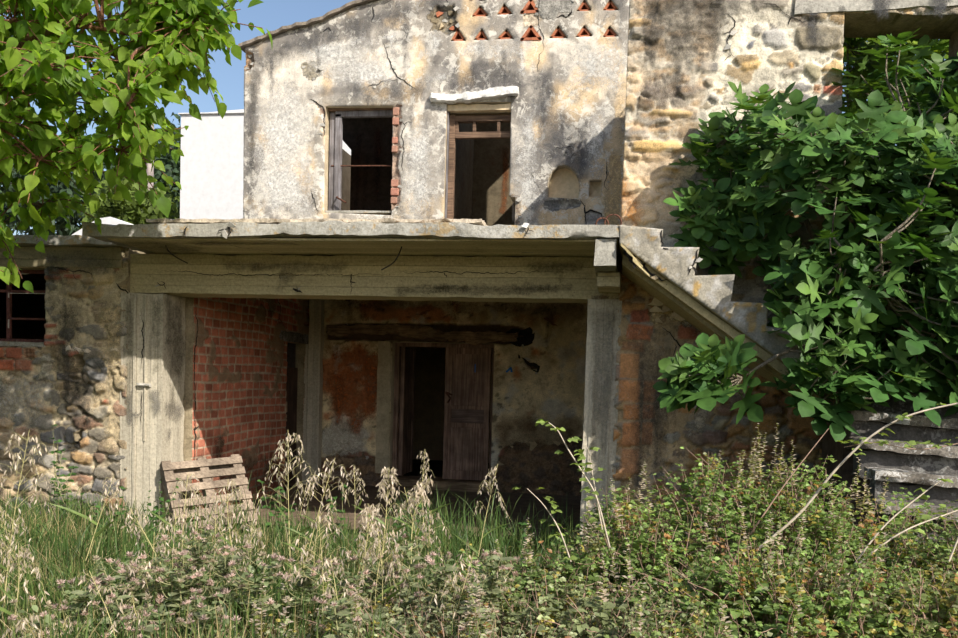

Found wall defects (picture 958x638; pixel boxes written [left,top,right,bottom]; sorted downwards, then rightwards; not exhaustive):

crack [369,5,414,88]
flaking render [426,3,461,56]
damp [643,0,721,102]
crack [218,221,236,239]
crack [155,270,578,325]
crack [116,283,144,421]